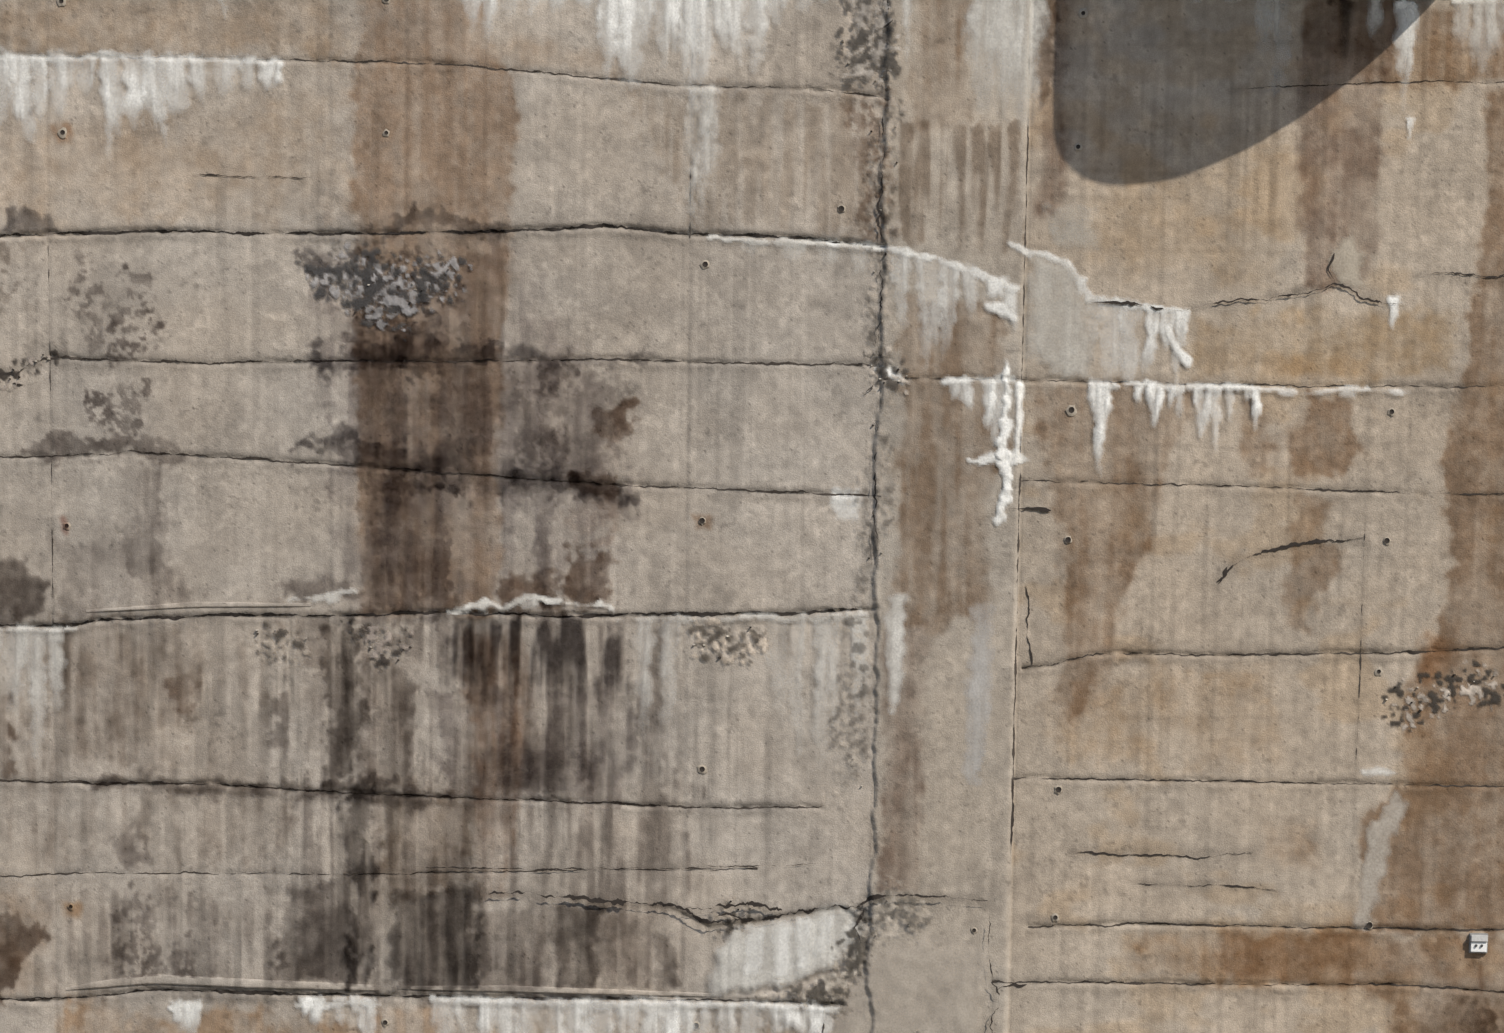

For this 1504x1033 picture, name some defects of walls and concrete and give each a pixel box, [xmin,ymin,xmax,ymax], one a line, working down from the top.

leakage [597,0,767,60]
leakage [2,55,67,118]
leakage [87,52,203,113]
leakage [708,235,846,249]
spalling [295,243,472,331]
crack [1094,253,1504,311]
leakage [864,242,1295,454]
leakage [942,364,1026,525]
crack [1217,537,1364,583]
leakage [448,580,614,672]
spalling [1382,660,1504,731]
leakage [300,931,375,1028]